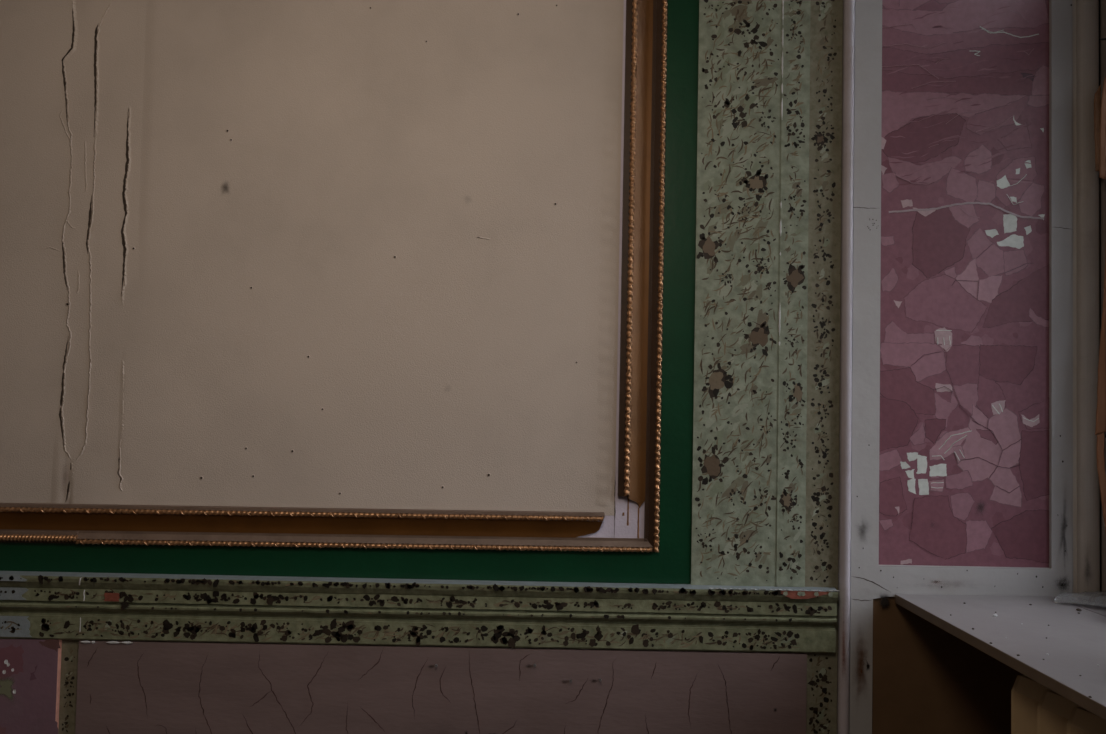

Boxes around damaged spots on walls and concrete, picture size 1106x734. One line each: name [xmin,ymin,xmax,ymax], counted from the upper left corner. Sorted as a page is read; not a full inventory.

crack [43,0,112,501]
crack [121,105,132,307]
crack [116,360,124,492]
crack [243,653,328,734]
crack [412,651,519,734]